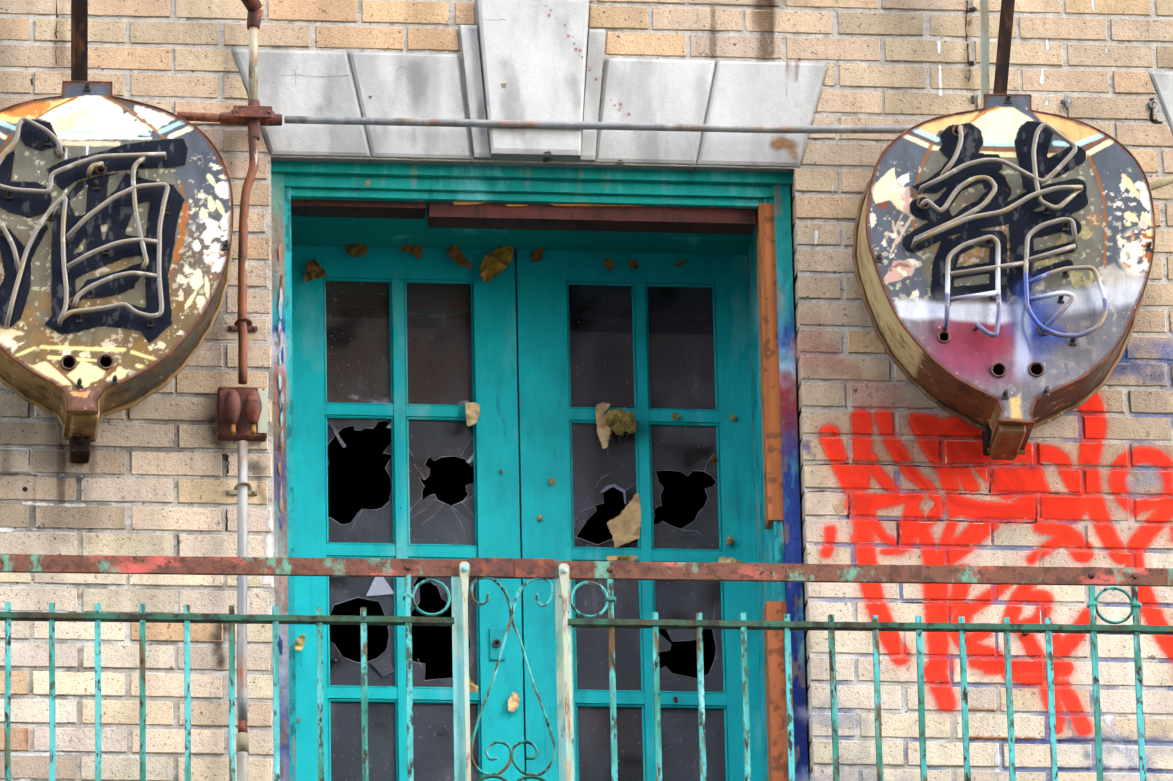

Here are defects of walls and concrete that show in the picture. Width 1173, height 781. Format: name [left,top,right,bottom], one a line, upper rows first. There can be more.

rust [772,137,796,158]